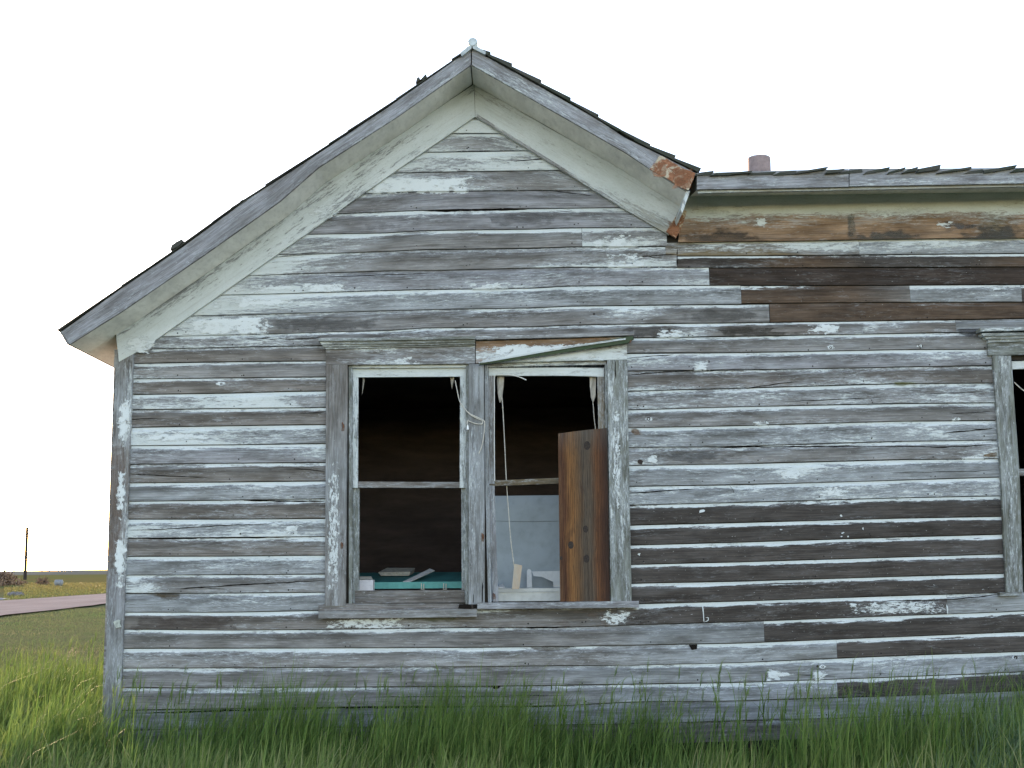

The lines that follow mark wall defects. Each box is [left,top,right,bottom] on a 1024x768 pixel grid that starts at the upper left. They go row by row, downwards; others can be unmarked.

peeling [126,335,156,355]
peeling [482,343,603,362]
peeling [116,471,126,520]
peeling [327,463,340,589]
peeling [326,618,404,629]
peeling [599,609,630,625]
peeling [849,602,943,614]